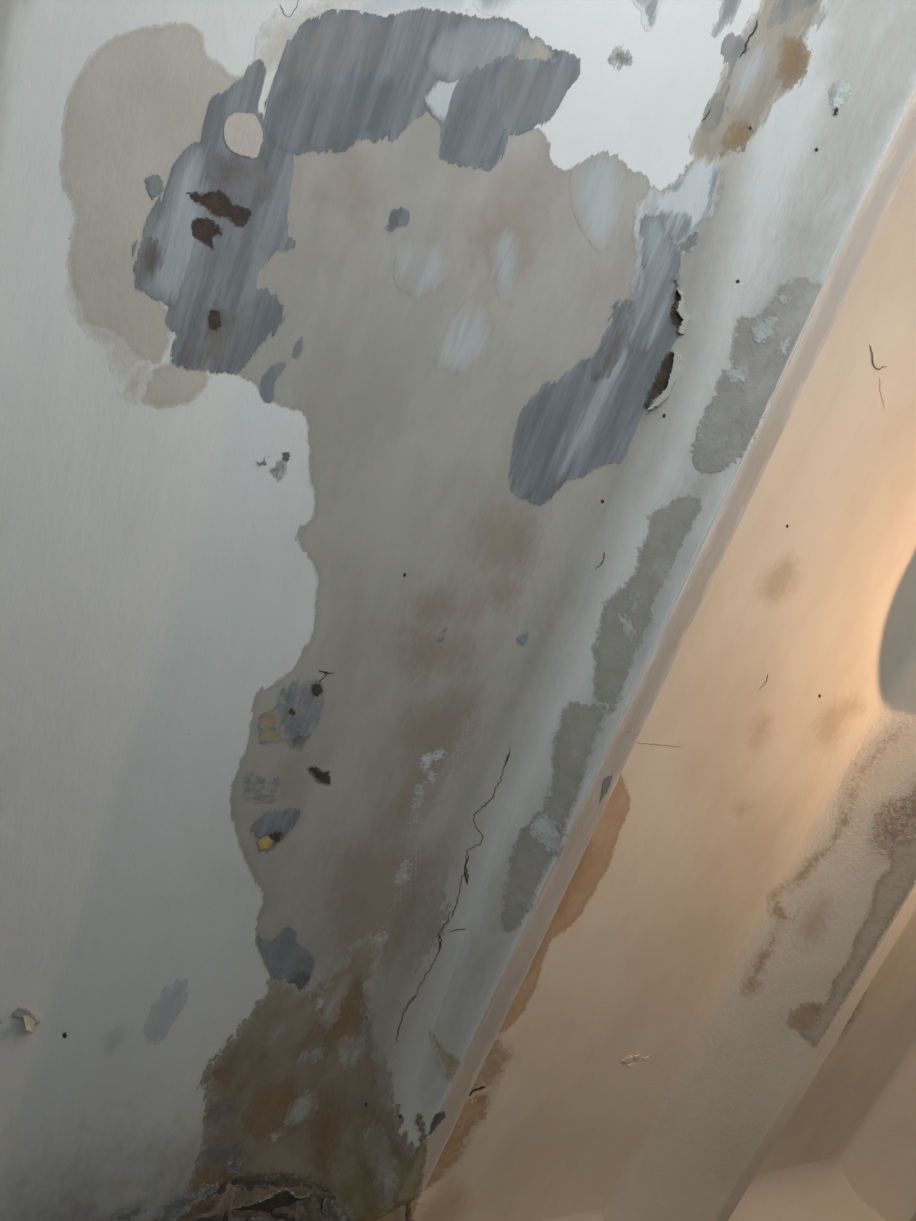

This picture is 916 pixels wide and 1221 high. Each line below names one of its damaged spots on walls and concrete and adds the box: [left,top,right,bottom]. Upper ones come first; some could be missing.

damp [59,21,244,410]
peeling [259,337,304,403]
peeling [132,6,581,375]
peeling [508,214,699,507]
peeling [254,670,334,751]
crack [395,746,511,1042]
damp [229,0,916,1221]
spalling [600,774,613,802]
spalling [99,1182,351,1221]